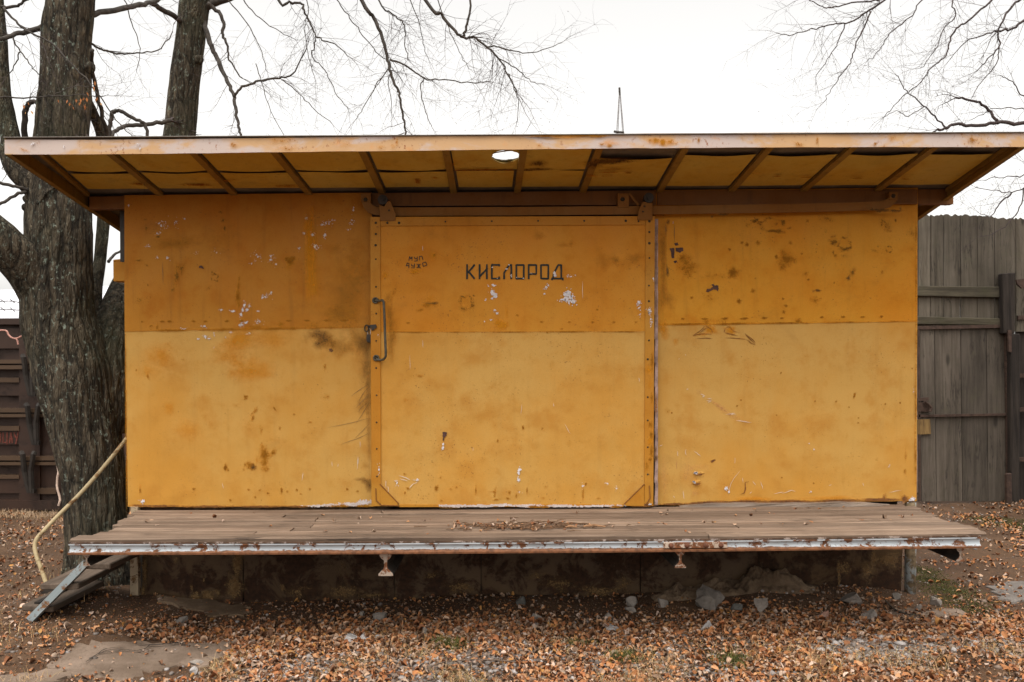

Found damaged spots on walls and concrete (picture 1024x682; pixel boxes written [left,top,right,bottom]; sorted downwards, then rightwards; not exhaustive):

peeling [544,271,577,306]
corrosion [243,447,275,471]
corrosion [126,452,311,508]